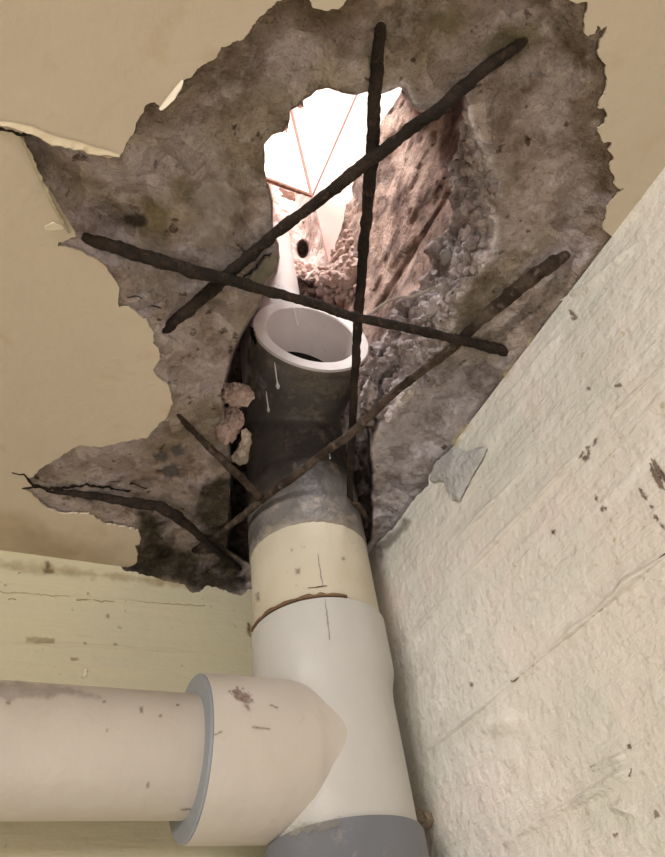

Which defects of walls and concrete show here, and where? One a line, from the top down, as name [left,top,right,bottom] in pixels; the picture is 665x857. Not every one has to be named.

crack [12,472,147,492]
spalling [0,0,620,596]